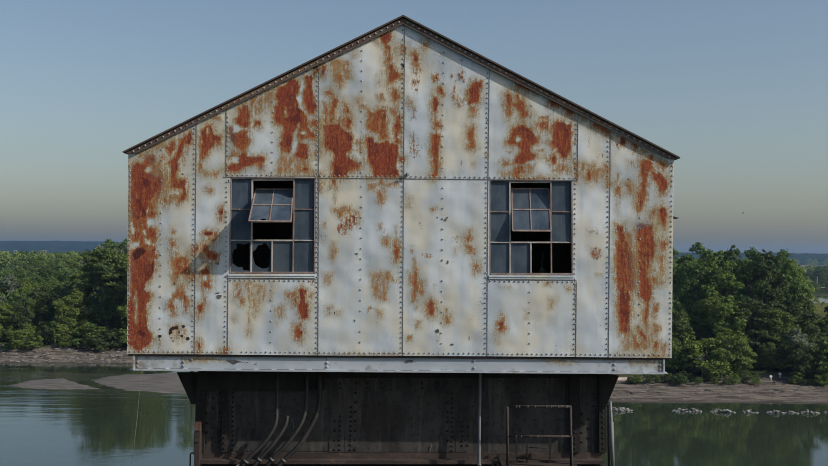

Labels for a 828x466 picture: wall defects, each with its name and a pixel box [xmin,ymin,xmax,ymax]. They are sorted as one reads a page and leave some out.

rust [127,31,484,354]
rust [494,67,673,358]